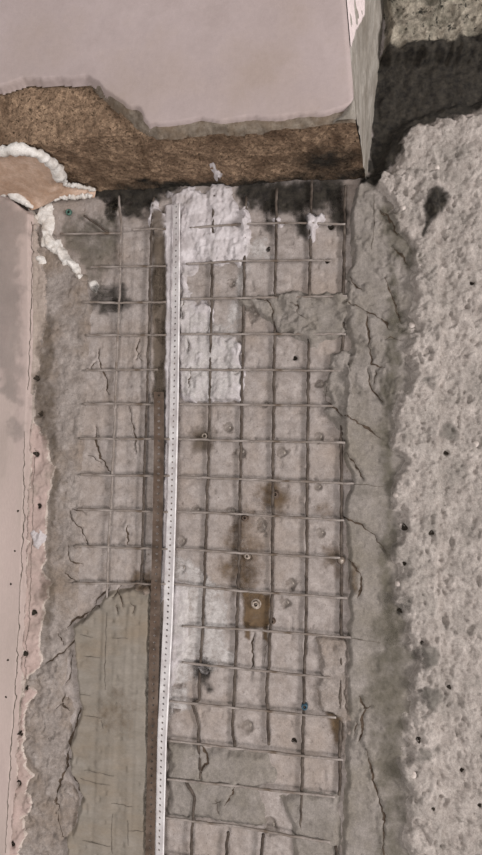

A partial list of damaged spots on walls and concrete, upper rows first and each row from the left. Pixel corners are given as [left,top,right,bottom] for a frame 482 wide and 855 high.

water stain [360,34,482,186]
water stain [296,203,308,237]
water stain [329,190,348,231]
water stain [422,186,448,236]
peeling [30,224,48,395]
water stain [92,284,128,313]
crack [346,277,401,402]
crack [88,427,109,471]
rust [223,545,271,640]
spalling [281,579,297,608]
crack [47,586,135,837]
crack [354,696,386,855]